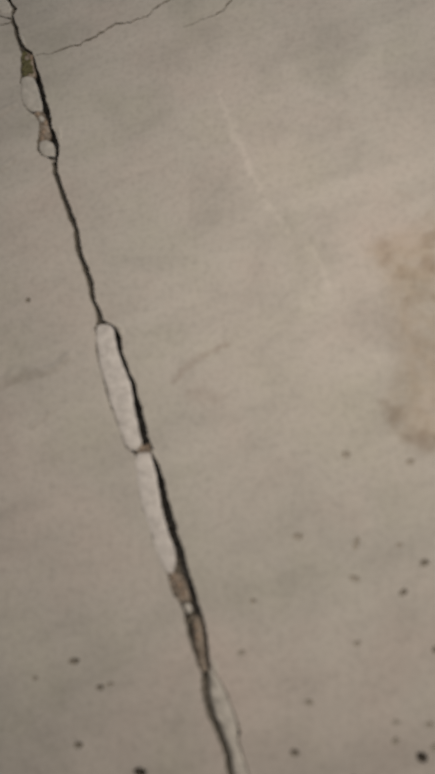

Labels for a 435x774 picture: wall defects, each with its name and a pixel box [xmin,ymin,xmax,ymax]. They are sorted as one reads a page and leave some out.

crack [0,0,248,774]
leakage [354,170,435,464]